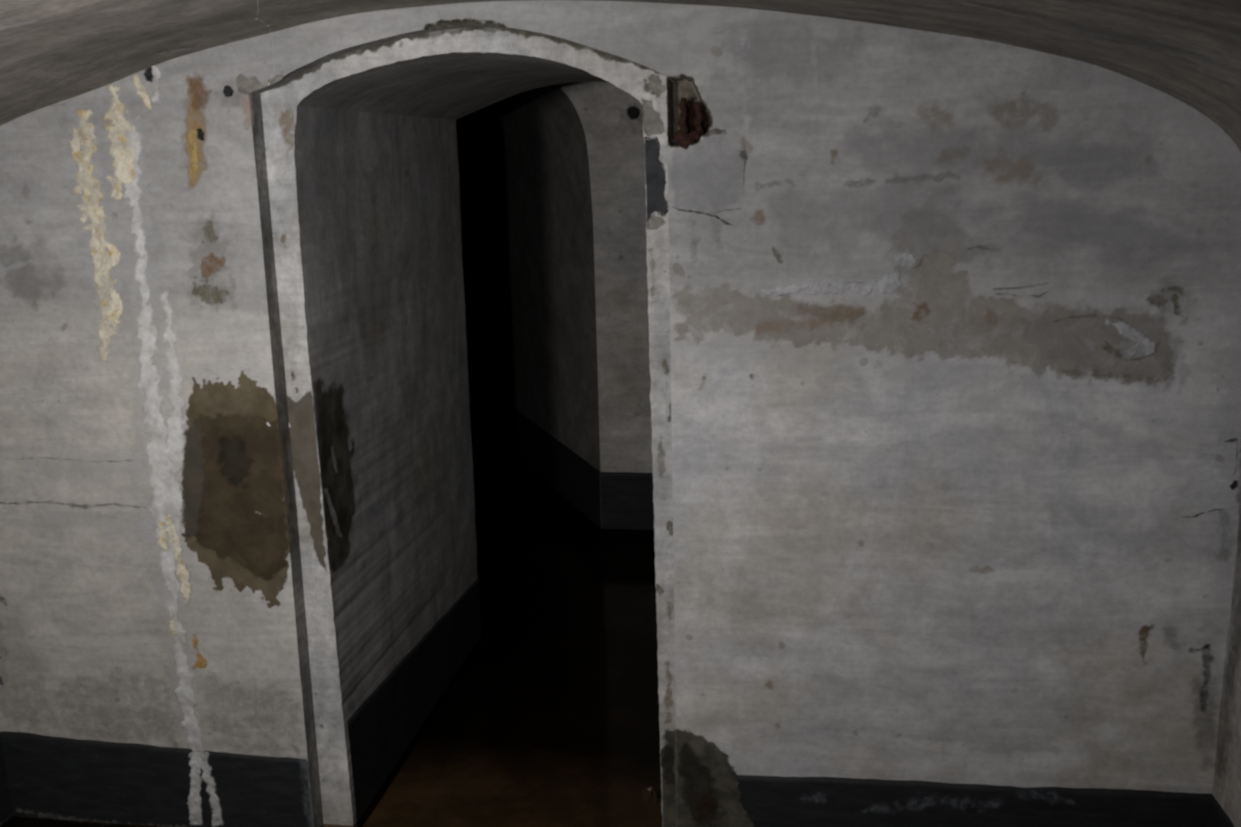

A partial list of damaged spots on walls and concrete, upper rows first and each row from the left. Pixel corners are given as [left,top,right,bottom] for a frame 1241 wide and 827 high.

rust [185,79,208,186]
spalling [627,74,725,229]
water stain [69,85,354,826]
water stain [661,729,754,827]